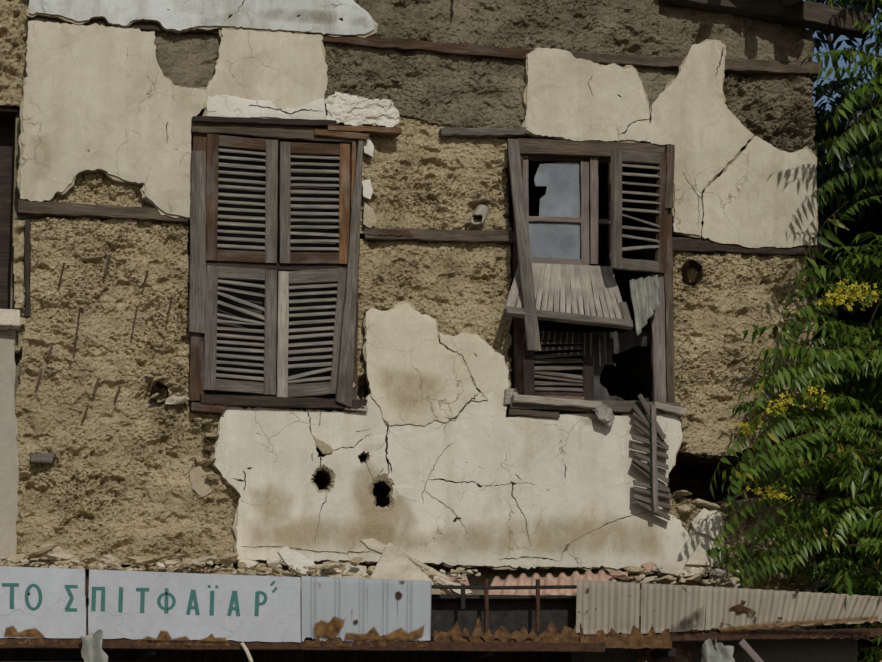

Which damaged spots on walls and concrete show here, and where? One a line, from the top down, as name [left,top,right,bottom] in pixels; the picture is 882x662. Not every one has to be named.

flaking render [154,32,220,88]
flaking render [50,171,152,208]
flaking render [323,0,817,399]
flaking render [15,217,239,565]
crack [438,332,487,419]
flaking render [673,251,815,459]
crack [311,425,391,473]
spalling [368,474,395,513]
crack [422,444,523,539]
crack [501,515,634,560]
rust [305,608,701,649]